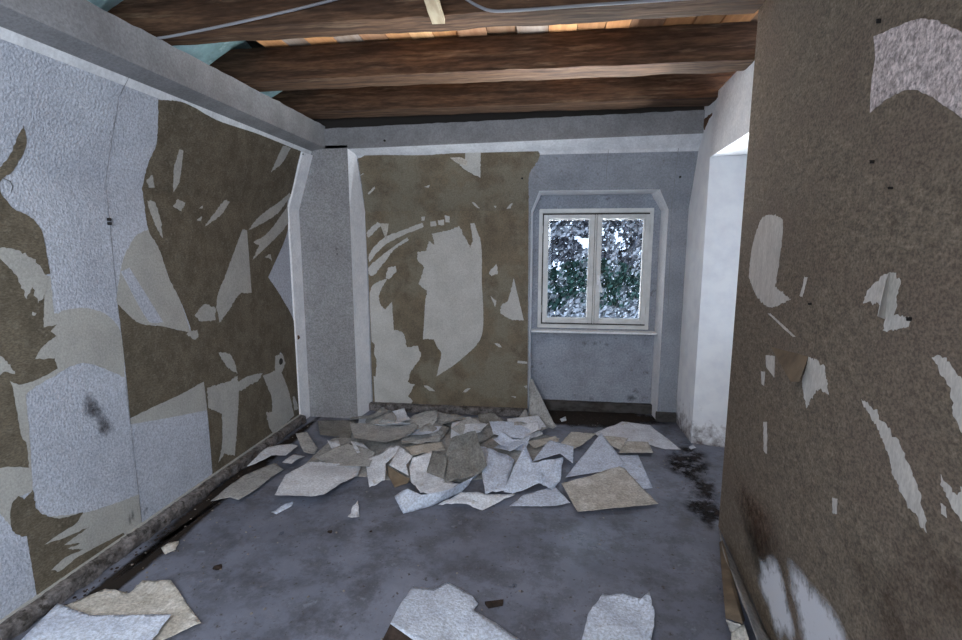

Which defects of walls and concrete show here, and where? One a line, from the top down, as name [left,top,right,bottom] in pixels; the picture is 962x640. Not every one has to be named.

flaking render [870,18,962,118]
peeling [173,149,185,211]
peeling [271,146,291,172]
peeling [451,152,481,177]
peeling [116,193,291,340]
peeling [367,215,524,403]
peeling [0,247,125,526]
peeling [130,352,299,463]
peeling [761,355,775,386]
peeling [46,495,142,572]